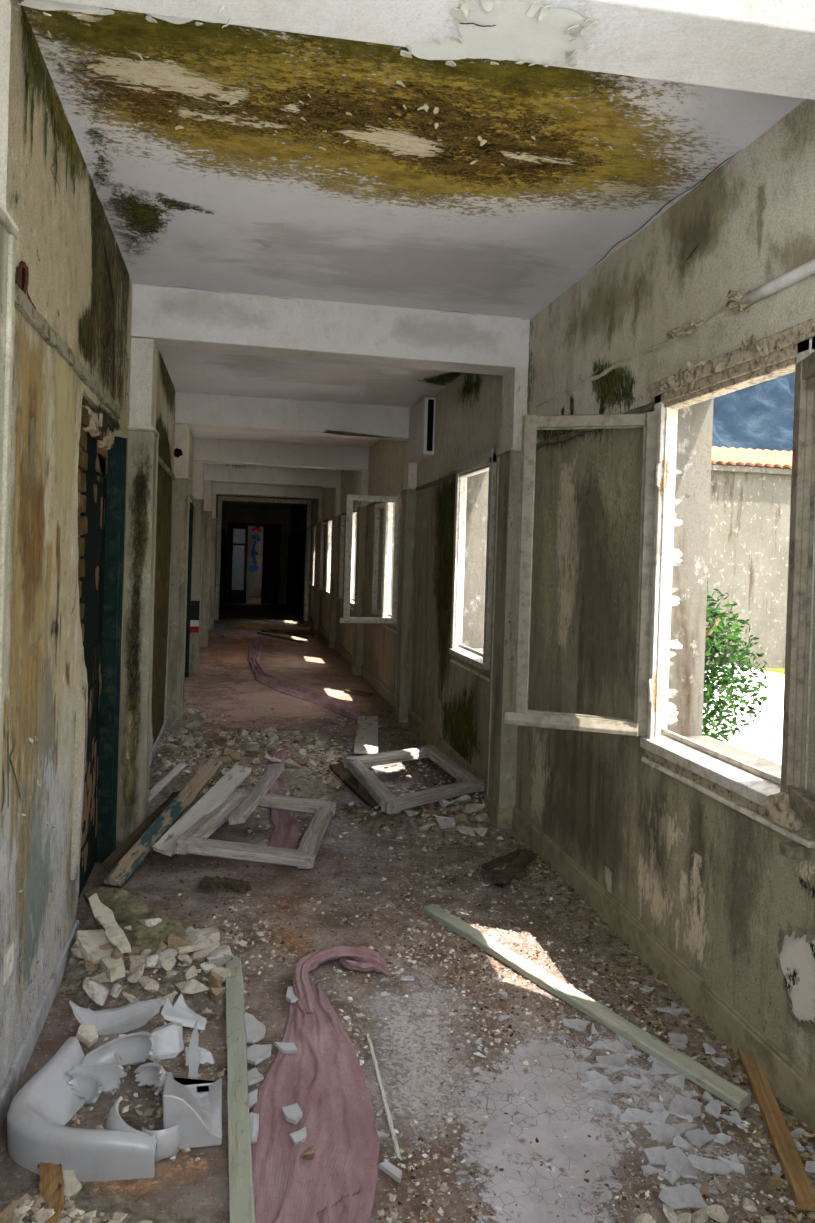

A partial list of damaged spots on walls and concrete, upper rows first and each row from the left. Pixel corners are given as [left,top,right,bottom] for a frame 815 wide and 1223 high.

peeling [400,0,598,68]
damp [21,9,214,512]
flaking render [78,395,121,642]
damp [0,653,82,1033]
peeling [80,738,99,872]
spalling [88,893,131,954]
peeling [776,925,815,1035]